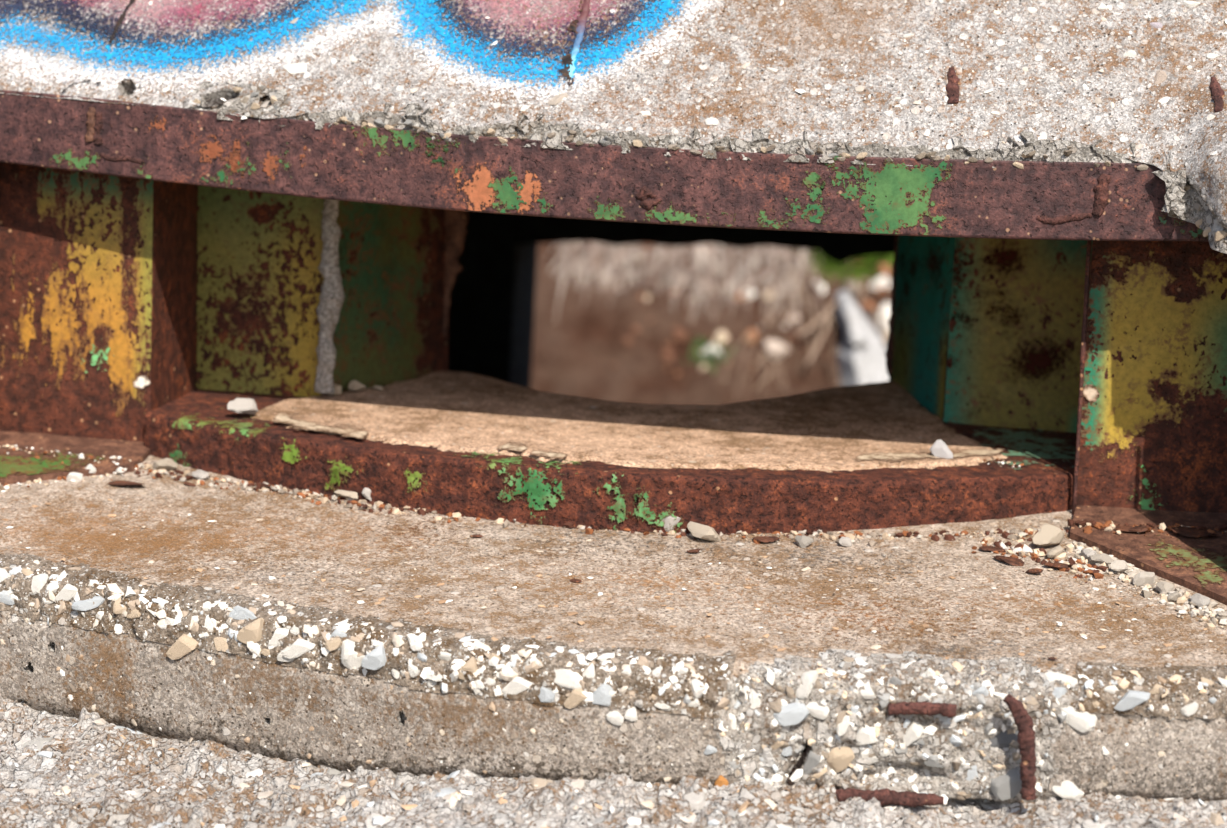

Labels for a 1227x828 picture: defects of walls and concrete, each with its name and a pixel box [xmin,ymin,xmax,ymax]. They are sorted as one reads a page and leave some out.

spalling [559,0,590,91]
spalling [116,70,140,98]
spalling [929,65,974,111]
spalling [1157,34,1225,120]
peeling [145,114,168,137]
peeling [0,149,153,418]
peeling [169,81,1227,510]
peeling [0,449,105,492]
peeling [100,498,191,558]
peeling [454,452,584,525]
peeling [592,471,683,533]